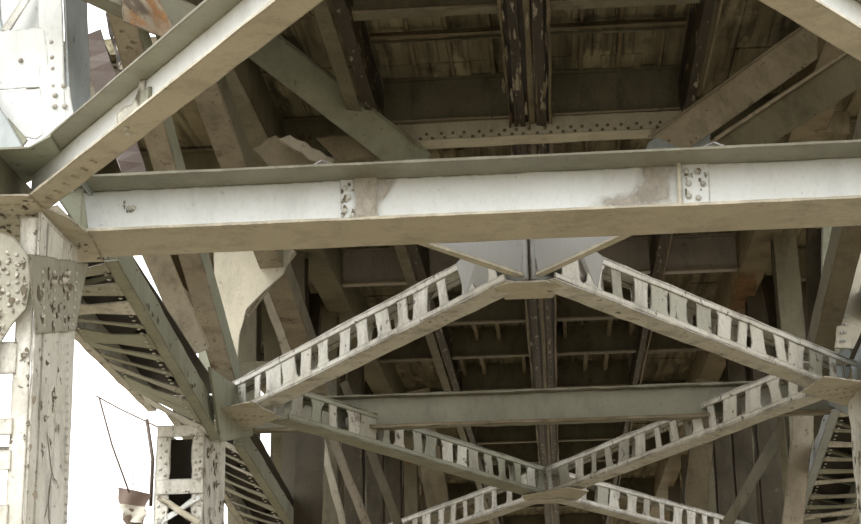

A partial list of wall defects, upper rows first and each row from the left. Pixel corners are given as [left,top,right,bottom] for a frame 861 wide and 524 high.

peeling [497,0,554,128]
peeling [0,249,27,328]
peeling [38,267,77,331]
peeling [525,294,557,389]